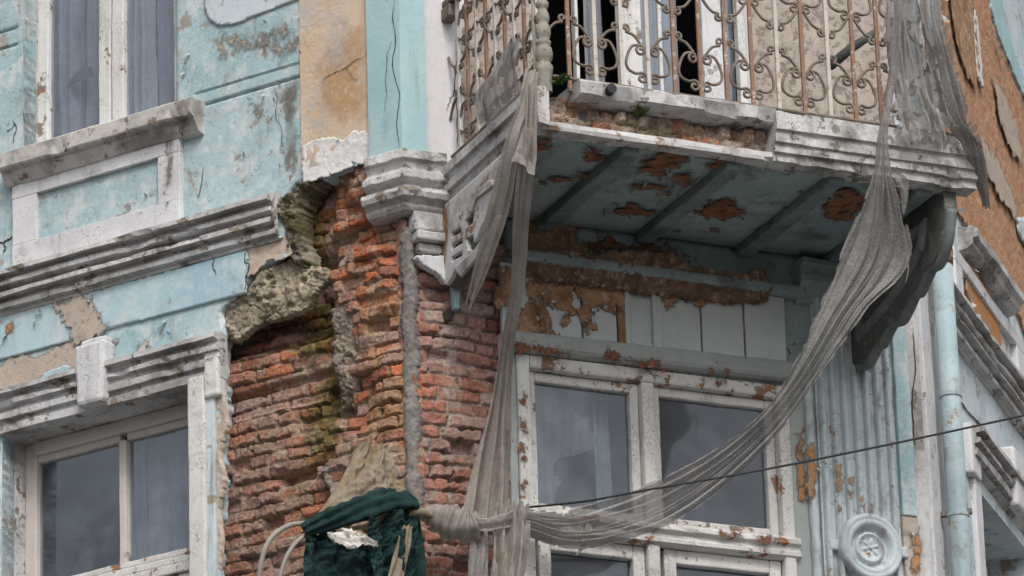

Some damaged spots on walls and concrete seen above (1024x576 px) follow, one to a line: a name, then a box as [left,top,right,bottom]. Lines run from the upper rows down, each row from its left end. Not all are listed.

peeling [214,14,302,65]
crack [324,0,400,147]
peeling [278,130,369,182]
spalling [549,97,766,218]
peeling [692,199,747,222]
spalling [940,0,1024,347]
peeling [0,291,119,389]
spalling [224,234,332,345]
spalling [330,303,364,413]
peeling [514,277,626,359]
crack [910,335,918,448]
spalling [795,427,859,512]